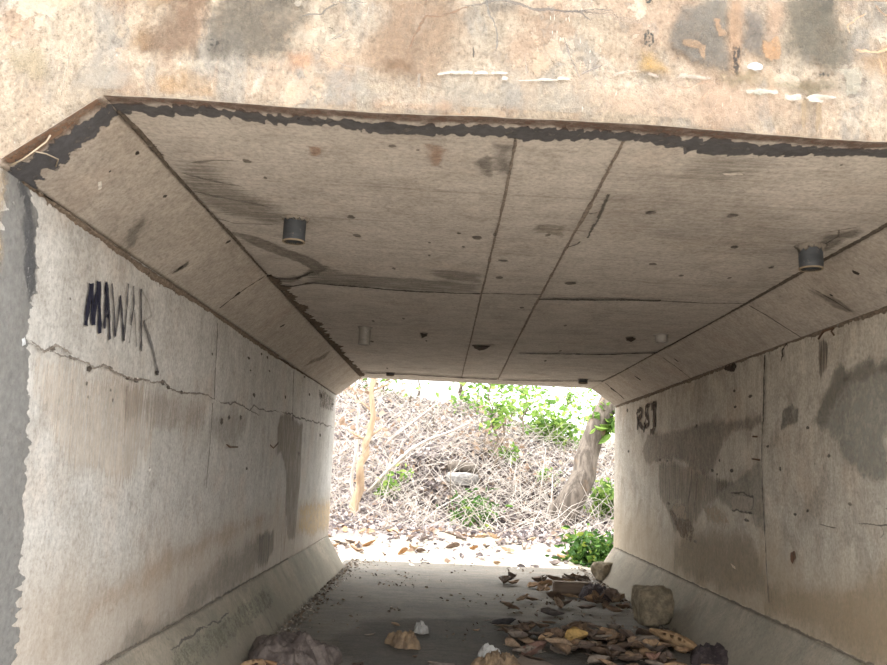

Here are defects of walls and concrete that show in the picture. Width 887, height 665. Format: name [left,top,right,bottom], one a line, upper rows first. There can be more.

leakage [210,0,304,54]
crack [407,0,644,54]
leakage [791,0,862,95]
leakage [745,88,836,103]
leakage [0,95,887,208]
crack [32,342,331,426]
leakage [781,405,798,429]
leakage [819,340,827,377]
leakage [818,359,887,478]
leakage [258,415,303,567]